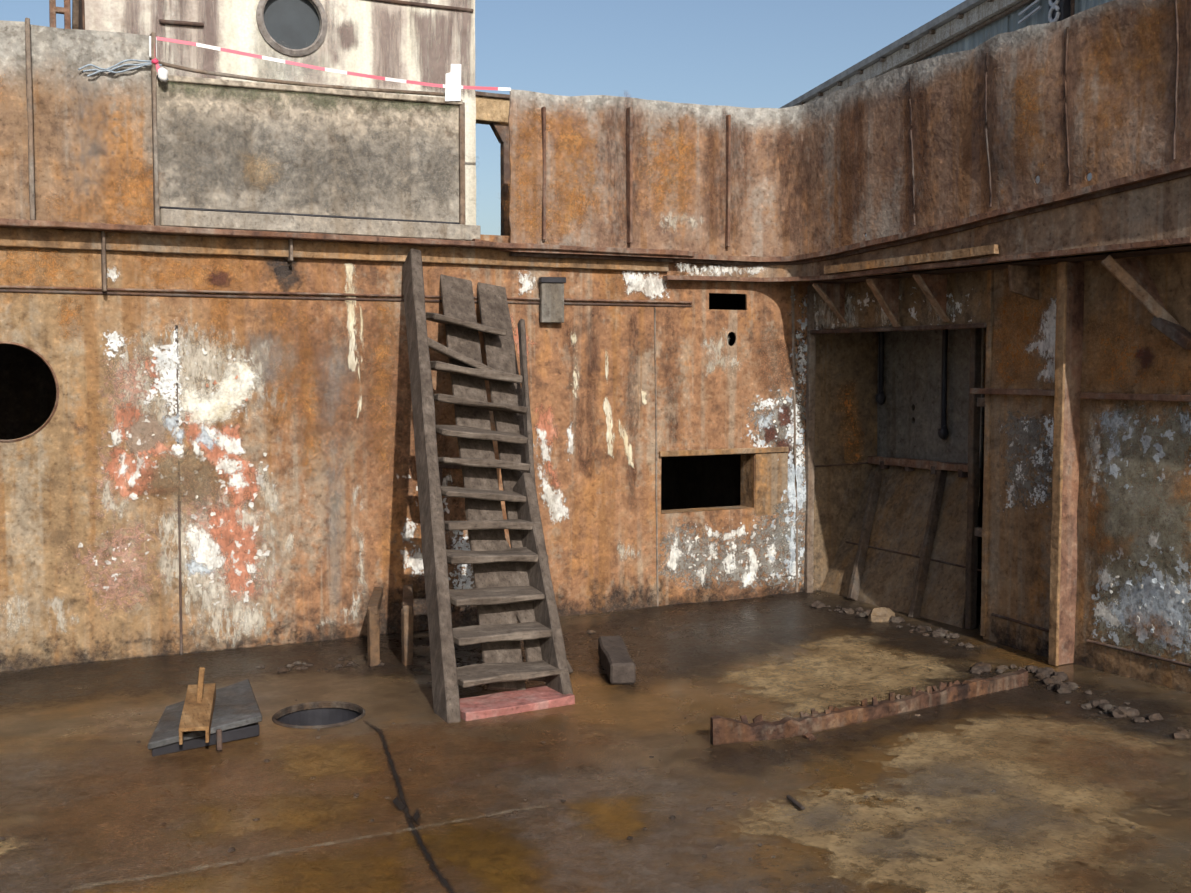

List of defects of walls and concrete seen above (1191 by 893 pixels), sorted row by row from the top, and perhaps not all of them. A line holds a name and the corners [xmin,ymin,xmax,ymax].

peeling [519,274,535,294]
peeling [624,271,667,299]
peeling [78,325,293,643]
peeling [401,518,424,575]
peeling [446,530,474,589]
peeling [659,293,892,594]
peeling [997,410,1054,513]
peeling [1087,393,1191,671]
crack [366,722,454,893]